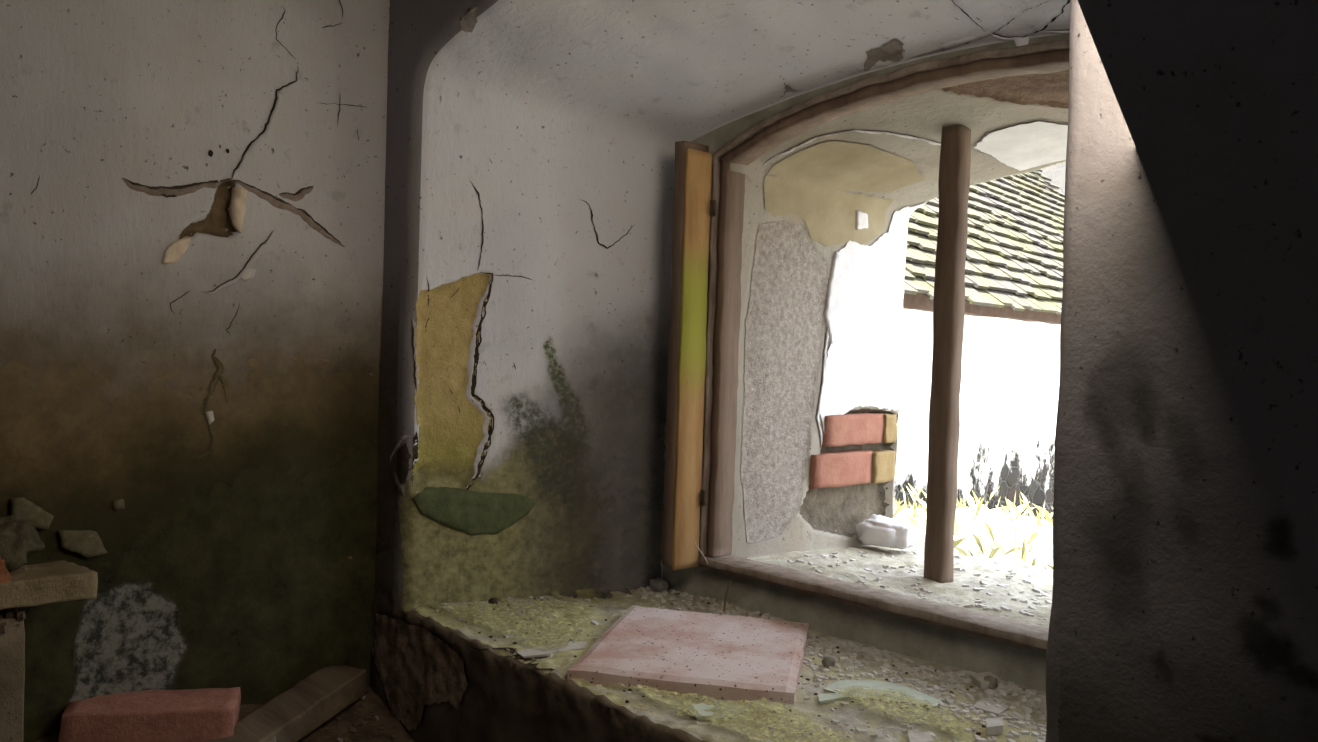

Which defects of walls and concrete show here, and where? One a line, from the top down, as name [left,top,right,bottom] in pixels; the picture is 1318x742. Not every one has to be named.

crack [231,7,363,179]
crack [909,0,1071,58]
flaking render [162,180,247,264]
damp [0,323,641,742]
flaking render [390,272,537,535]
damp [555,348,668,599]
flaking render [741,175,927,543]